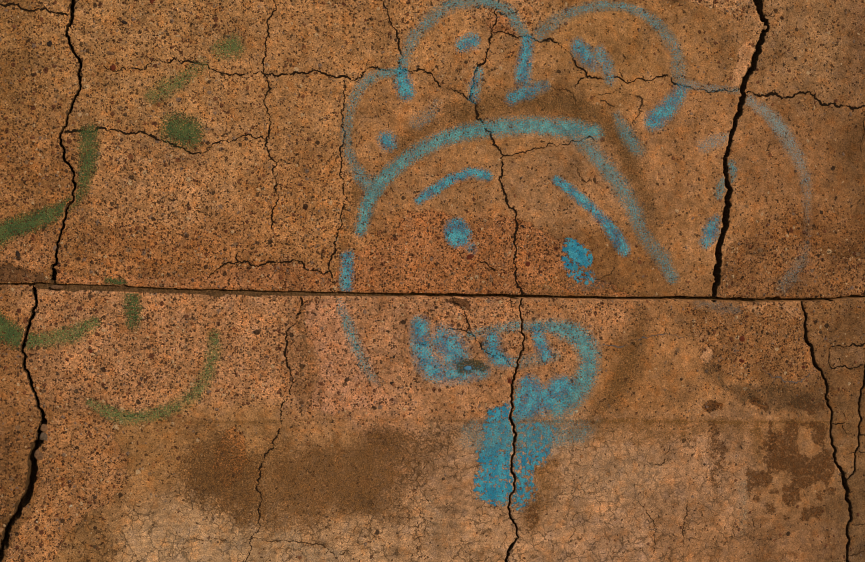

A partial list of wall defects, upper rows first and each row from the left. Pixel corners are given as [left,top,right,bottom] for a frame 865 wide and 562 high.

crack [0,0,441,292]
crack [448,0,865,562]
crack [0,286,51,562]
crack [192,297,355,562]
water stain [182,431,450,535]